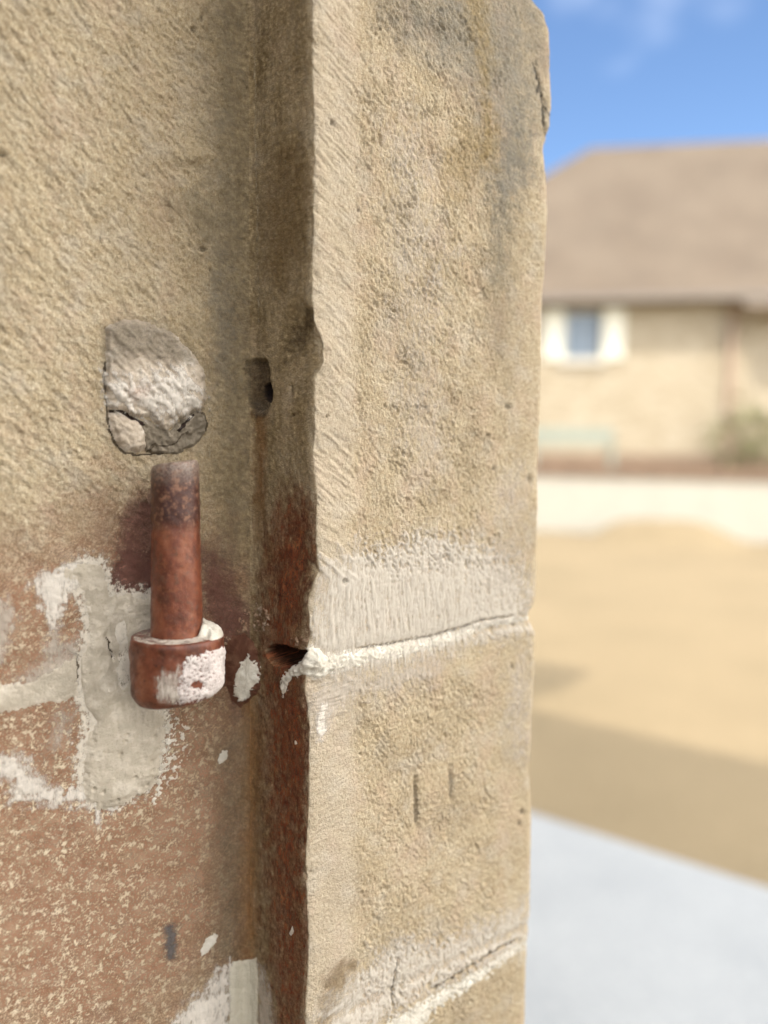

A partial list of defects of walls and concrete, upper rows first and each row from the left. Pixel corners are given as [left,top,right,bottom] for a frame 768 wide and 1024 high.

corrosion [0,495,153,685]
spalling [271,644,307,665]
crack [361,616,509,649]
corrosion [0,663,250,1024]
corrosion [201,488,317,1024]